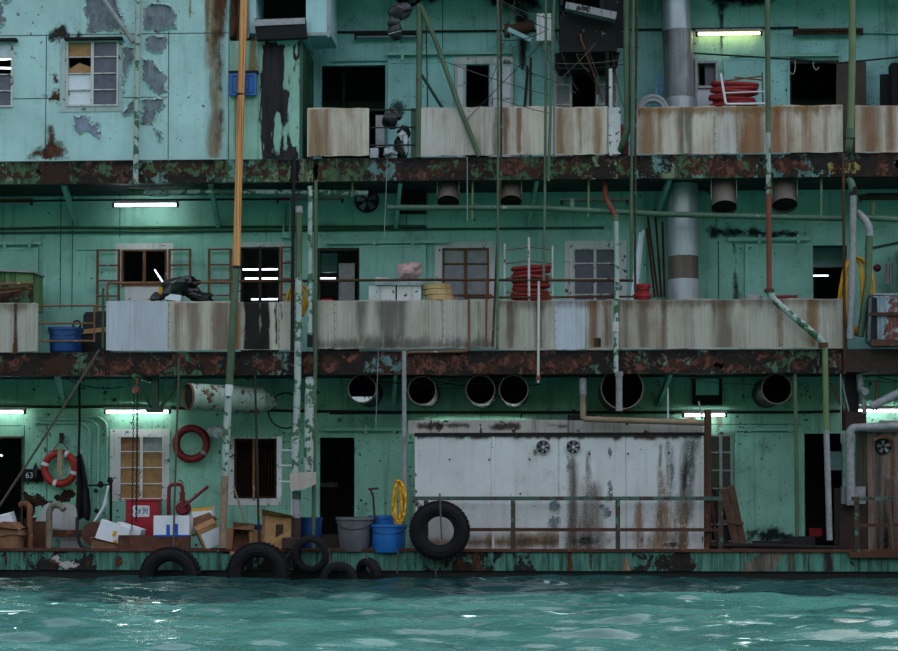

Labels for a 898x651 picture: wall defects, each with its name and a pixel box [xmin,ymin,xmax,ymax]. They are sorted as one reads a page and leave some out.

peeling [0,0,45,37]
peeling [83,0,125,34]
peeling [121,2,178,144]
corrosion [206,0,237,156]
corrosion [33,126,64,159]
peeling [73,115,101,140]
corrosion [741,106,761,153]
corrosion [772,106,790,152]
water stain [566,459,592,549]